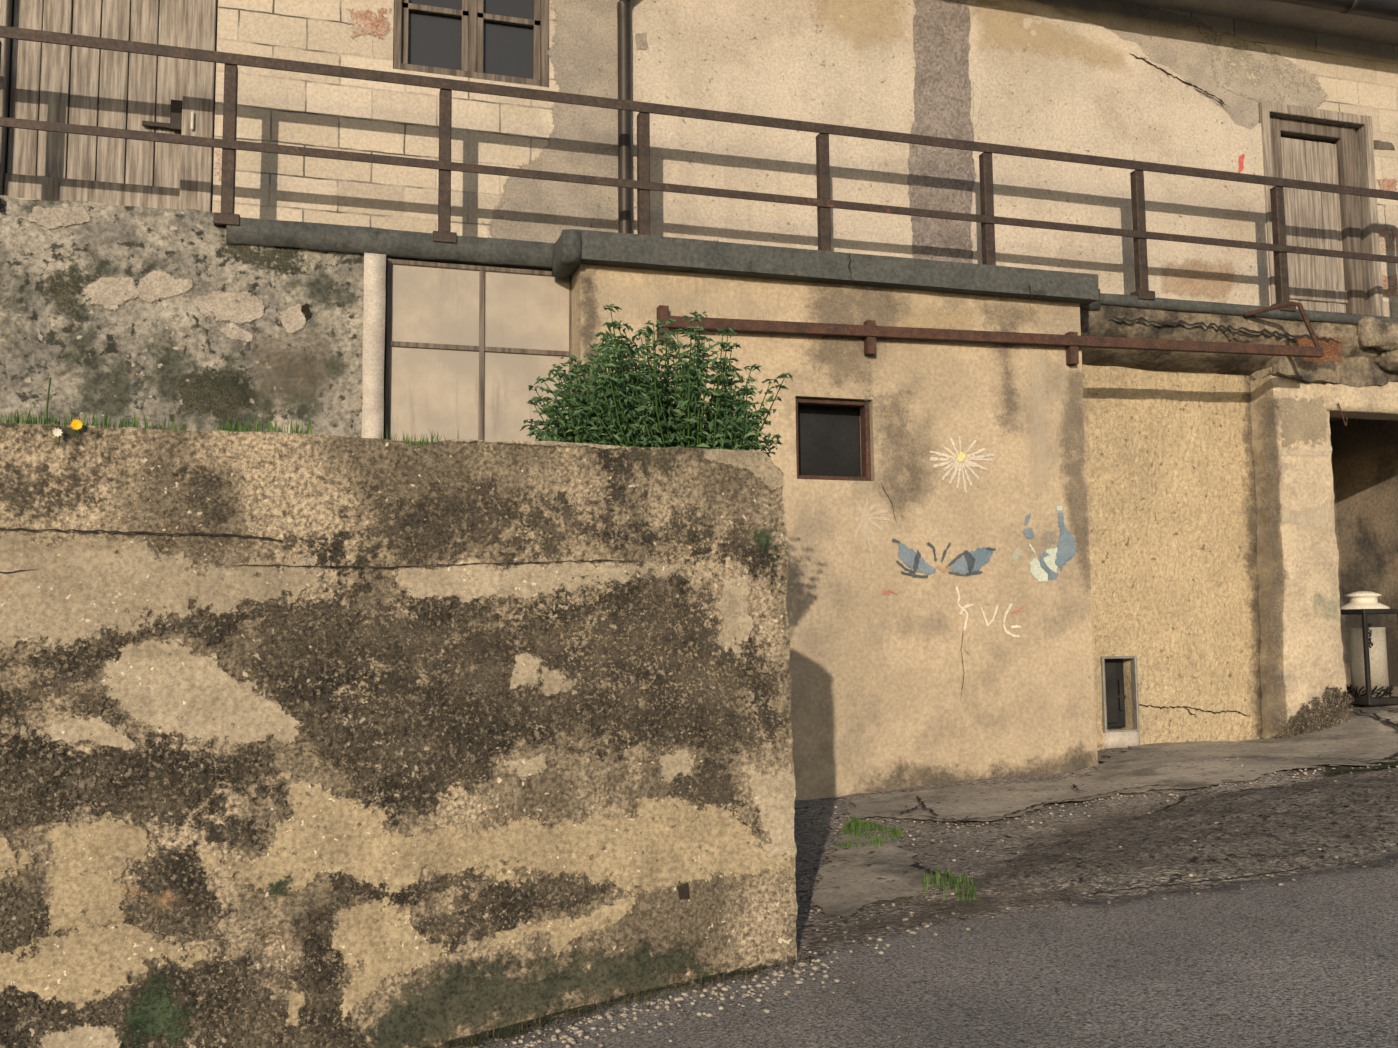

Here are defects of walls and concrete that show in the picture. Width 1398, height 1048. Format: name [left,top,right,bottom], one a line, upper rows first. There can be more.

flaking render [345,7,392,39]
crack [1129,53,1230,108]
flaking render [214,149,222,180]
spalling [1373,140,1395,150]
flaking render [1377,178,1397,191]
water stain [42,255,101,332]
water stain [809,285,969,384]
water stain [1061,372,1091,588]
crack [0,528,633,568]
water stain [0,429,791,1048]
crack [891,704,1398,851]
crack [912,861,949,878]